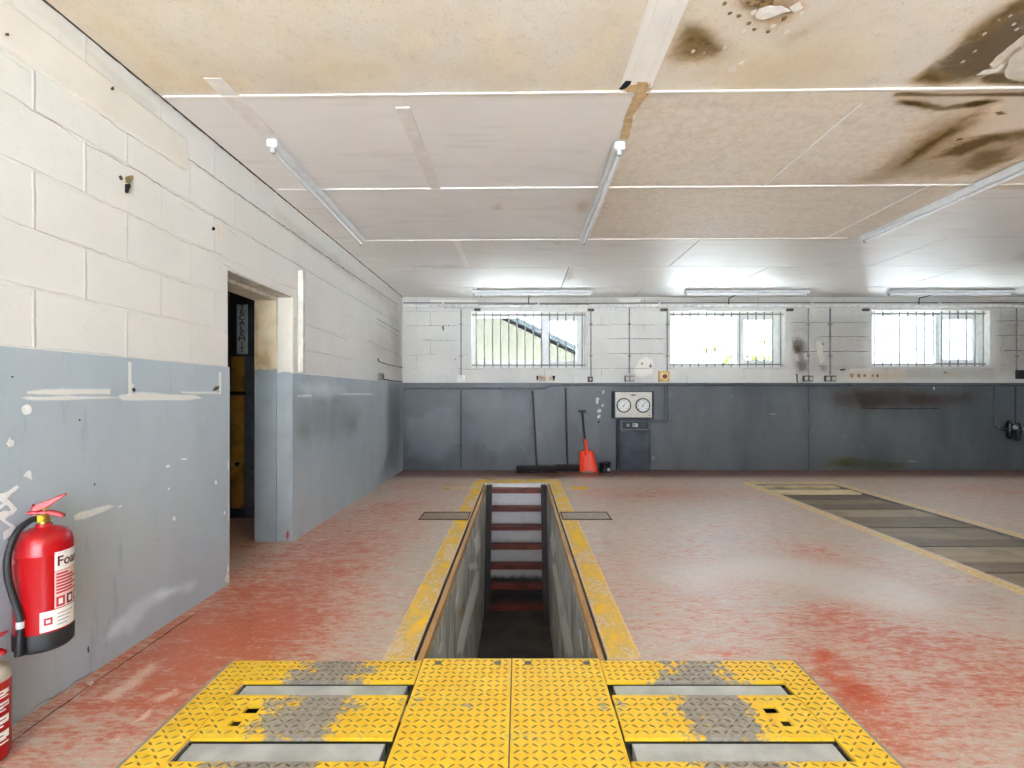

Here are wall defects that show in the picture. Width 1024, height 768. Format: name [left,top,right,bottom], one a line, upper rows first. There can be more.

spalling [722,0,811,35]
water stain [664,2,908,90]
spalling [976,14,1024,81]
water stain [845,0,1024,187]
water stain [852,308,1024,412]
peeling [0,475,26,540]